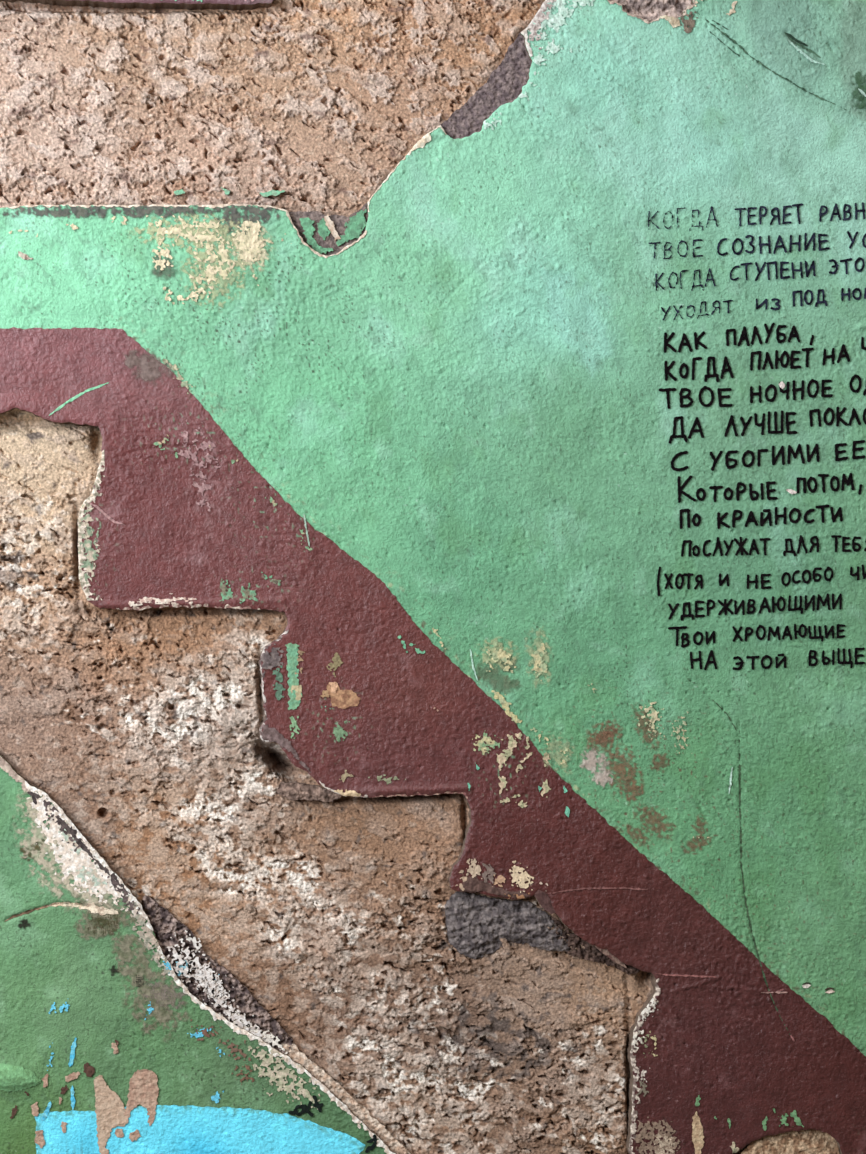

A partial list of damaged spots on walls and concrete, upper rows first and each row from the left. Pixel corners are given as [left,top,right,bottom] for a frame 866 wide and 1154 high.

crack [699,14,846,110]
spalling [784,32,825,65]
flaking render [0,0,703,307]
flaking render [0,408,704,1154]
peeling [762,1108,804,1131]